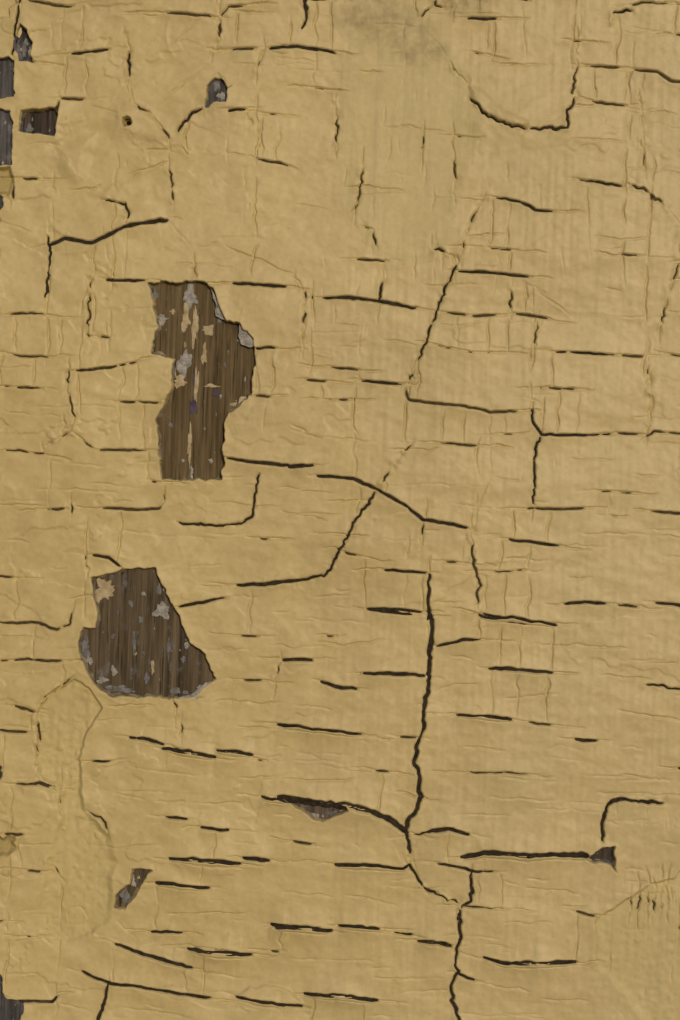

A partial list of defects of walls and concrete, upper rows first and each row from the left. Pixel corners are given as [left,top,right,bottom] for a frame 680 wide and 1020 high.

peeling [0,25,58,224]
peeling [205,71,233,108]
crack [167,0,337,65]
crack [470,66,680,131]
crack [10,170,174,315]
peeling [148,281,256,482]
crack [232,171,680,511]
peeling [36,568,215,944]
crack [102,456,680,1020]
peeling [0,835,18,858]
peeling [0,975,24,1020]
crack [82,970,211,1020]